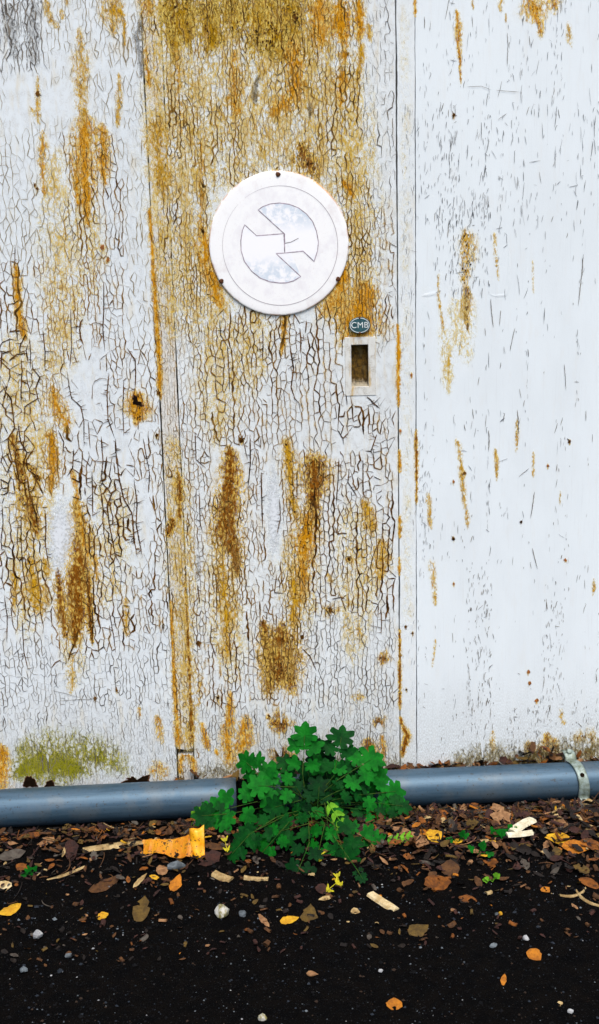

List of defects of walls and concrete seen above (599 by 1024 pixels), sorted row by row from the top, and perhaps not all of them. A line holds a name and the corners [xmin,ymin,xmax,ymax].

rust [520,0,560,37]
rust [0,29,133,694]
rust [123,0,413,780]
crack [0,0,599,788]
rust [437,229,478,393]
rust [452,440,470,525]
leakage [10,730,129,785]